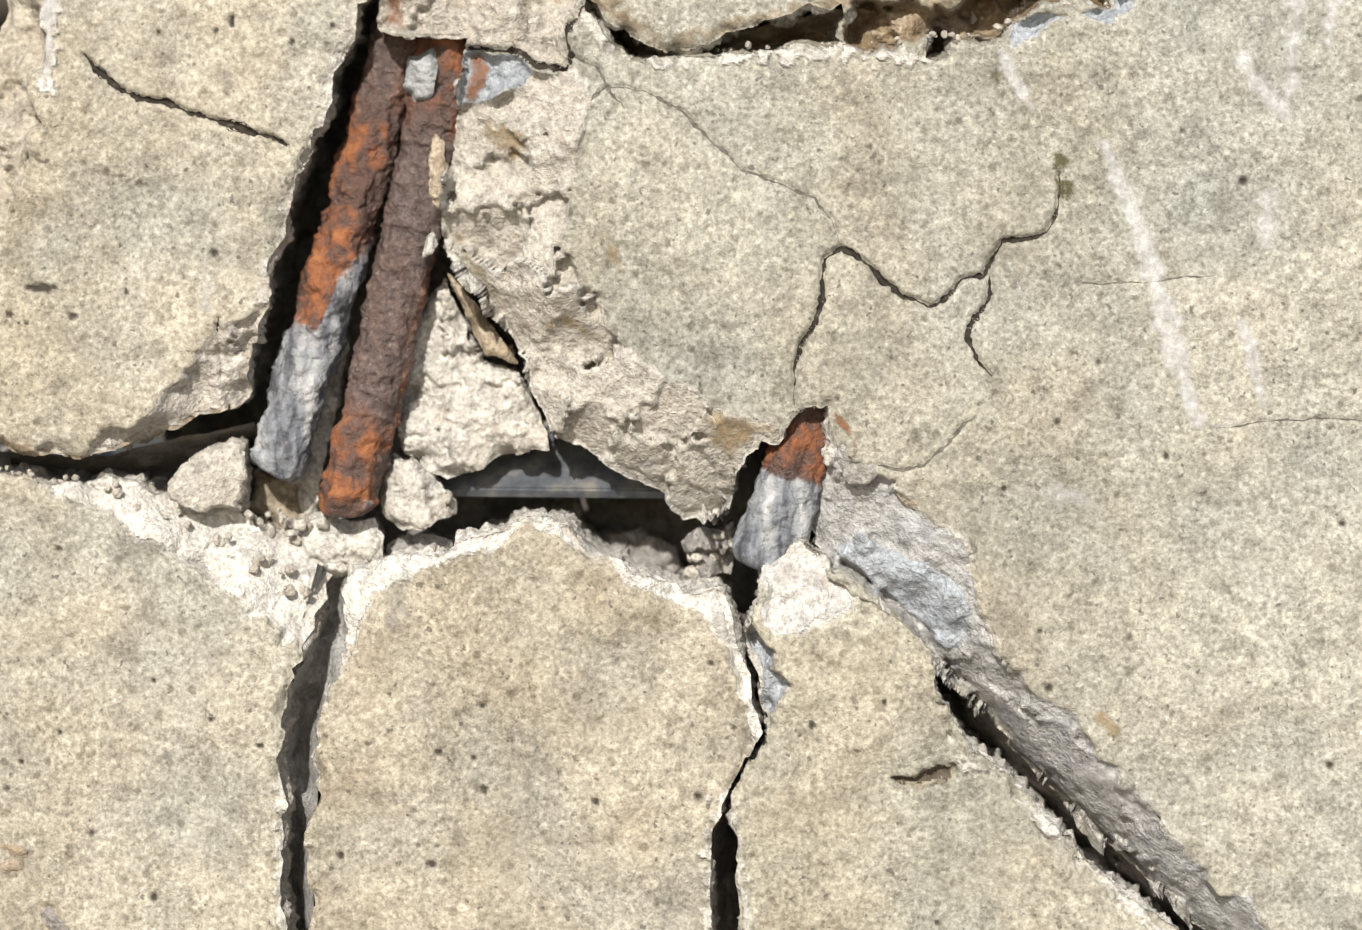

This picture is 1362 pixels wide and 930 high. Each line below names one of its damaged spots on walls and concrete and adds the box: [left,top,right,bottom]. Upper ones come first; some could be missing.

crack [1059,0,1114,8]
crack [85,55,288,146]
spalling [380,0,779,514]
crack [465,0,1061,405]
crack [0,404,262,481]
spalling [91,312,257,447]
crack [878,415,976,472]
crack [738,613,747,626]
crack [279,563,353,930]
crack [711,672,765,930]
crack [935,675,1203,930]